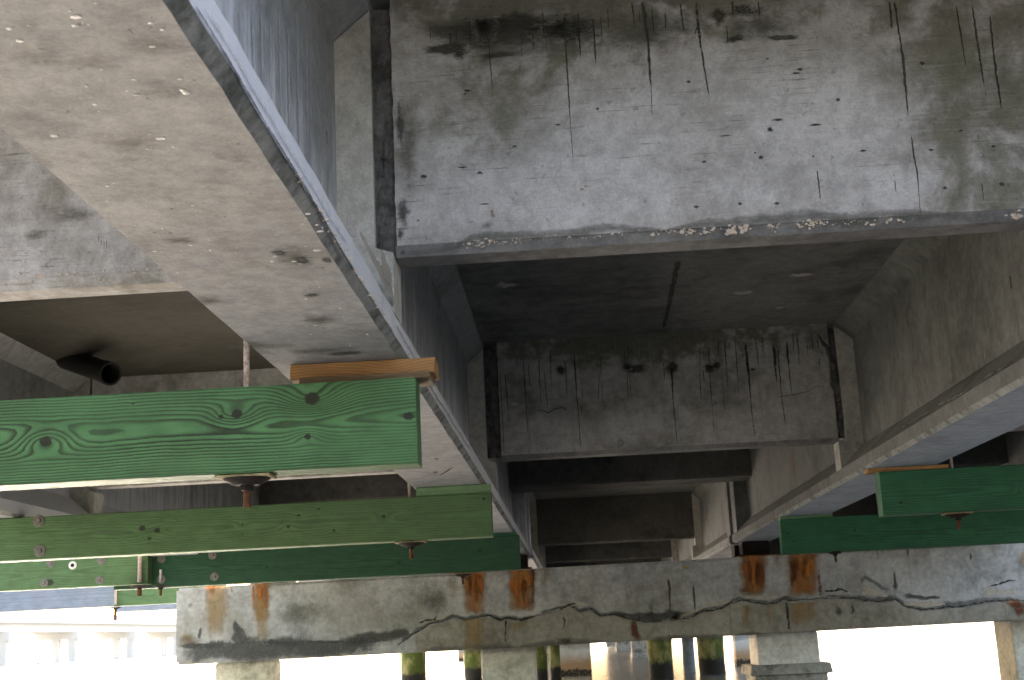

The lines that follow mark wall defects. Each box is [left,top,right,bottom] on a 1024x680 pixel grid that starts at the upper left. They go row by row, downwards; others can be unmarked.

leakage [428,9,609,155]
crack [894,2,920,206]
leakage [699,333,844,435]
rust [209,585,224,625]
rust [252,583,268,633]
leakage [182,621,409,663]
rust [466,572,484,613]
crack [397,603,620,645]
rust [510,569,534,609]
rust [739,555,764,594]
rust [790,554,822,594]
crack [645,580,1024,629]